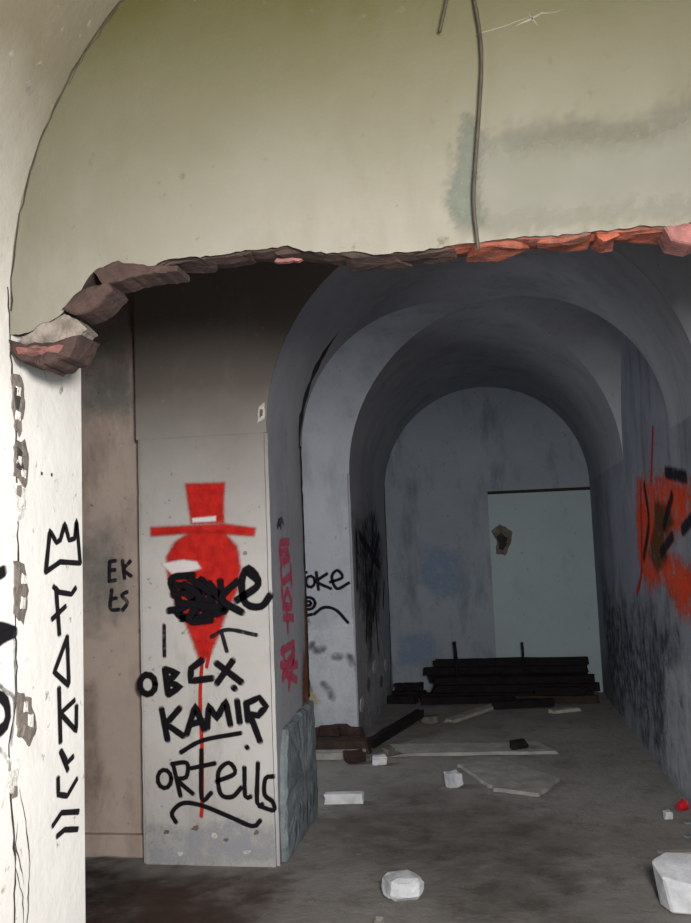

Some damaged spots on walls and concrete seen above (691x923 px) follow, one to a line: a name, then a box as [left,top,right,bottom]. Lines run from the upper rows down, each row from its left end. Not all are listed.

leakage [449,103,691,229]
flaking render [9,222,691,377]
flaking render [10,374,29,522]
flaking render [257,402,266,423]
flaking render [13,561,29,625]
flaking render [491,524,512,556]